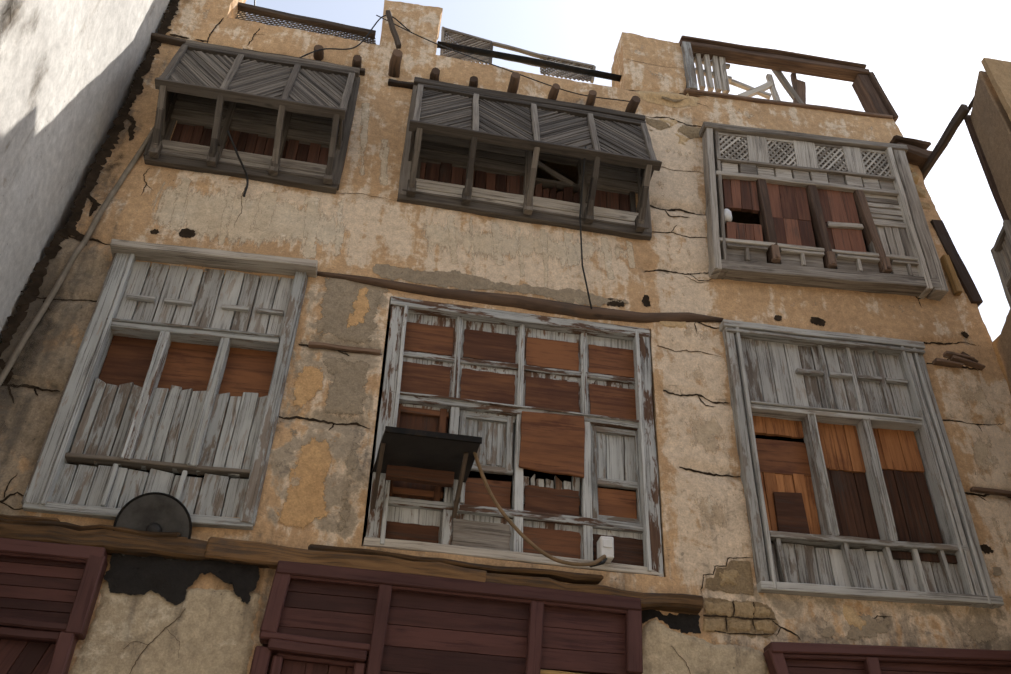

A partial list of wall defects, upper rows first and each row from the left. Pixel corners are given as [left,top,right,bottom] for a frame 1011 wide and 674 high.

crack [650,205,707,238]
spalling [315,264,629,344]
crack [645,269,714,283]
crack [1,384,60,403]
spalling [293,356,370,420]
crack [0,475,24,510]
peeling [276,428,362,530]
flaking render [642,560,778,638]